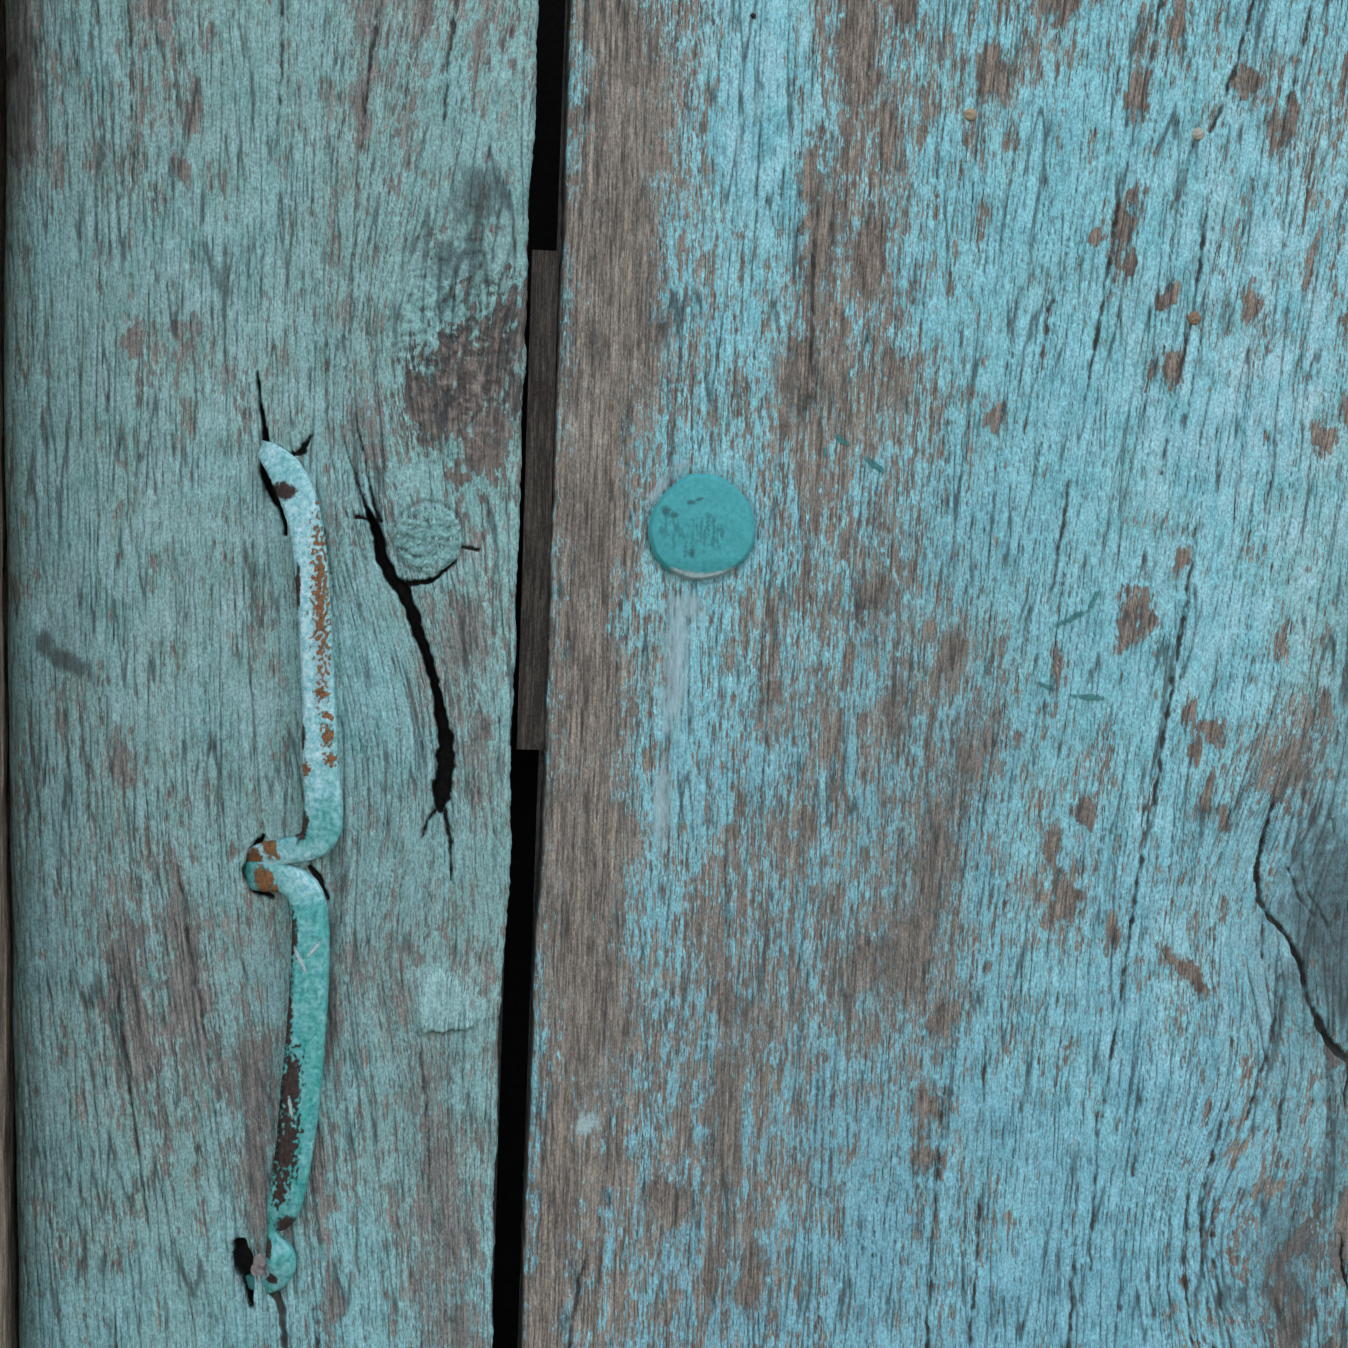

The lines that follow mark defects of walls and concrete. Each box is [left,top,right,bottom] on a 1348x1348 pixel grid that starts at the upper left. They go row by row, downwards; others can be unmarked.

peeling [1086,171,1149,289]
peeling [320,263,528,551]
corrosion [247,840,280,893]
corrosion [302,501,339,776]
crack [257,373,480,880]
peeling [523,0,718,1348]
peeling [1038,794,1125,958]
peeling [1112,545,1191,655]
peeling [1181,684,1344,845]
peeling [85,827,295,1283]
corrosion [271,910,304,1211]
crack [1168,802,1348,1348]